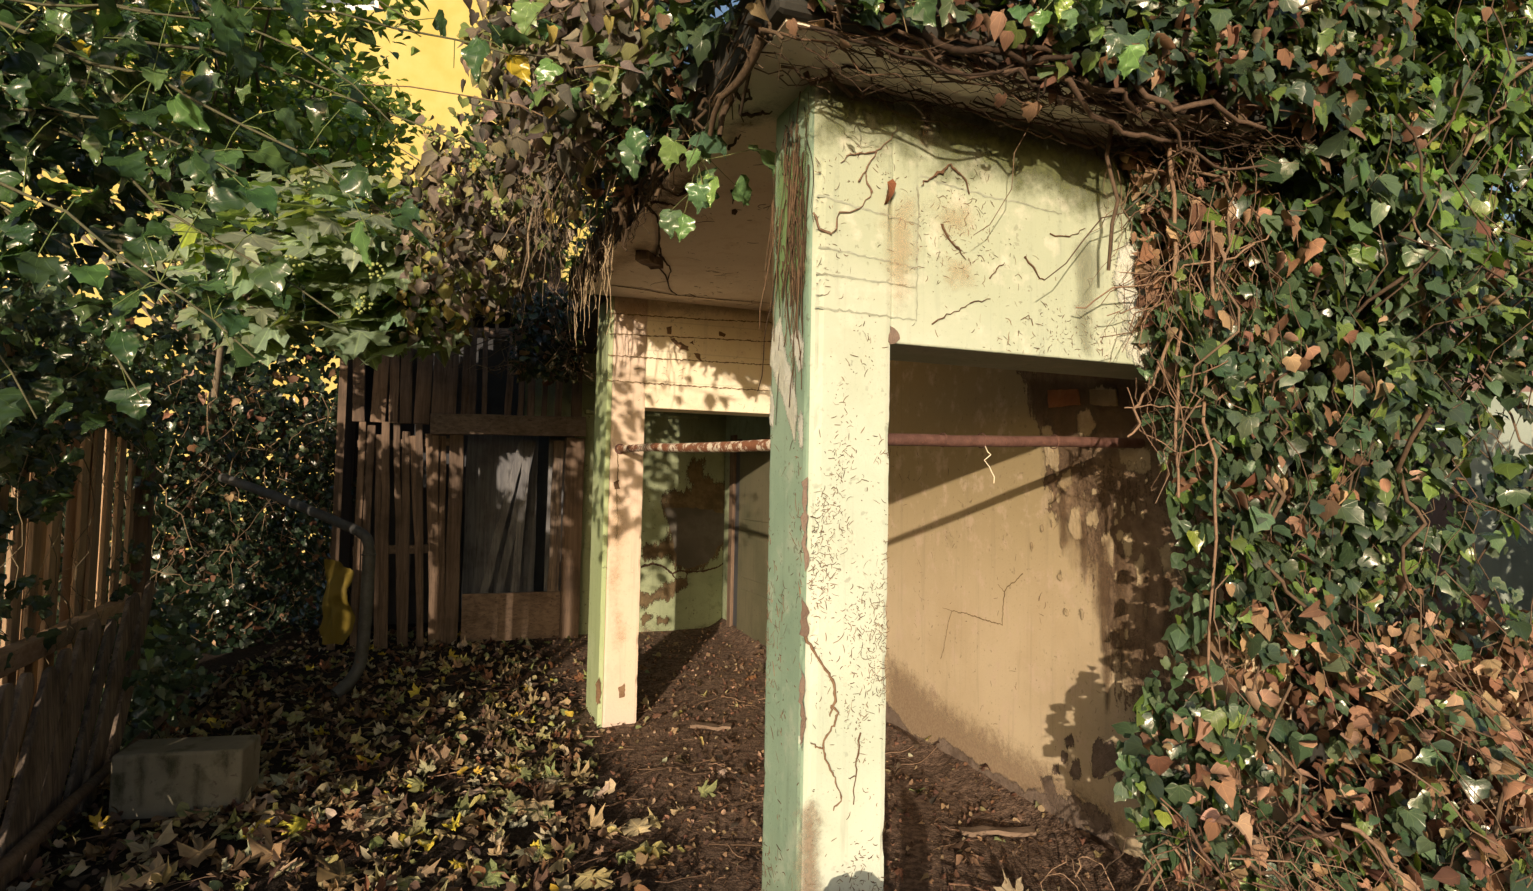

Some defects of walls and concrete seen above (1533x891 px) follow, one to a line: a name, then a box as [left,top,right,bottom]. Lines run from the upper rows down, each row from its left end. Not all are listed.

damp [777,157,805,299]
crack [815,175,1062,321]
spalling [888,326,900,345]
flaking render [639,456,725,627]
crack [941,573,1023,657]
flaking render [1016,240,1225,757]
damp [1061,491,1214,708]
spalling [885,702,1124,851]